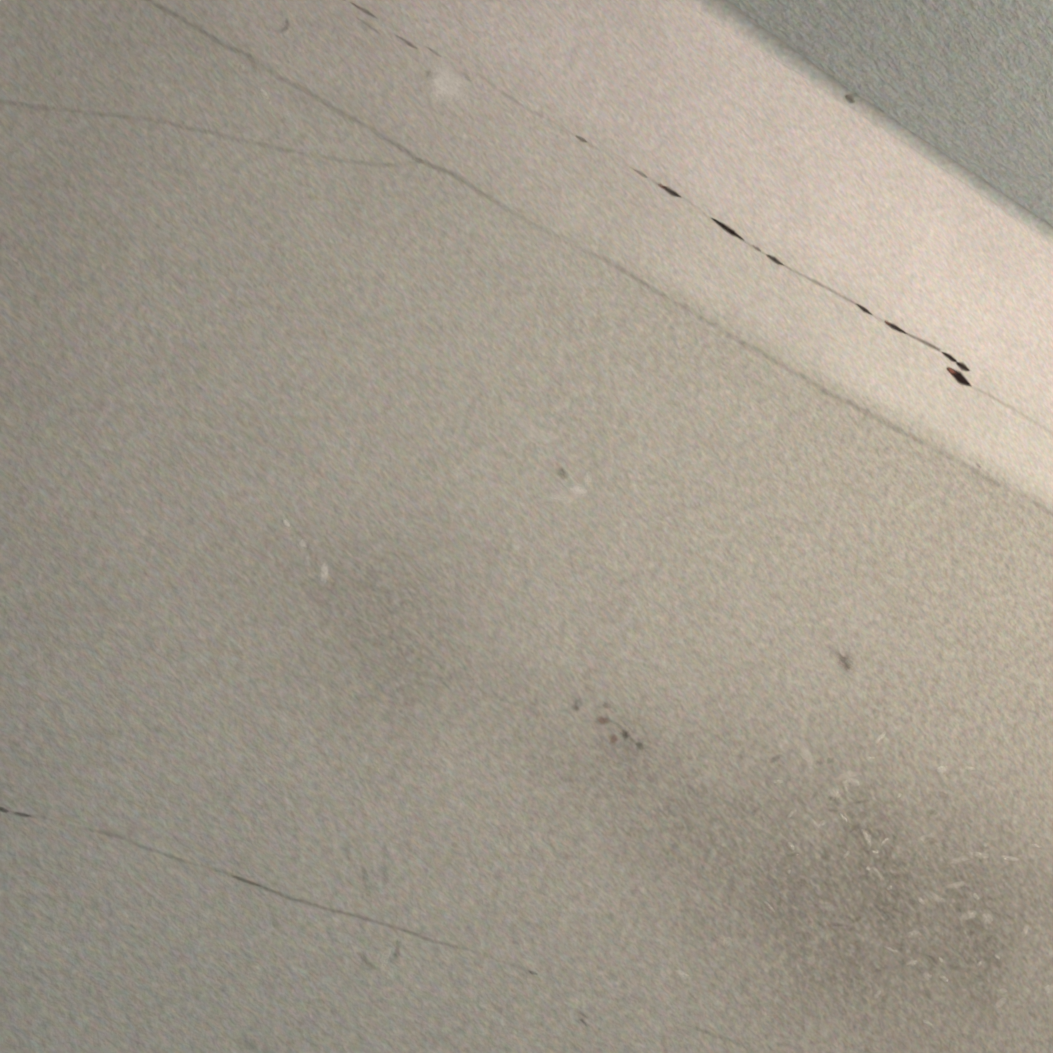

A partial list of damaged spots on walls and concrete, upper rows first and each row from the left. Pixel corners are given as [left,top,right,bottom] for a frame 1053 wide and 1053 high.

crack [660,184,680,197]
crack [713,219,743,240]
crack [857,304,906,333]
crack [929,344,971,386]